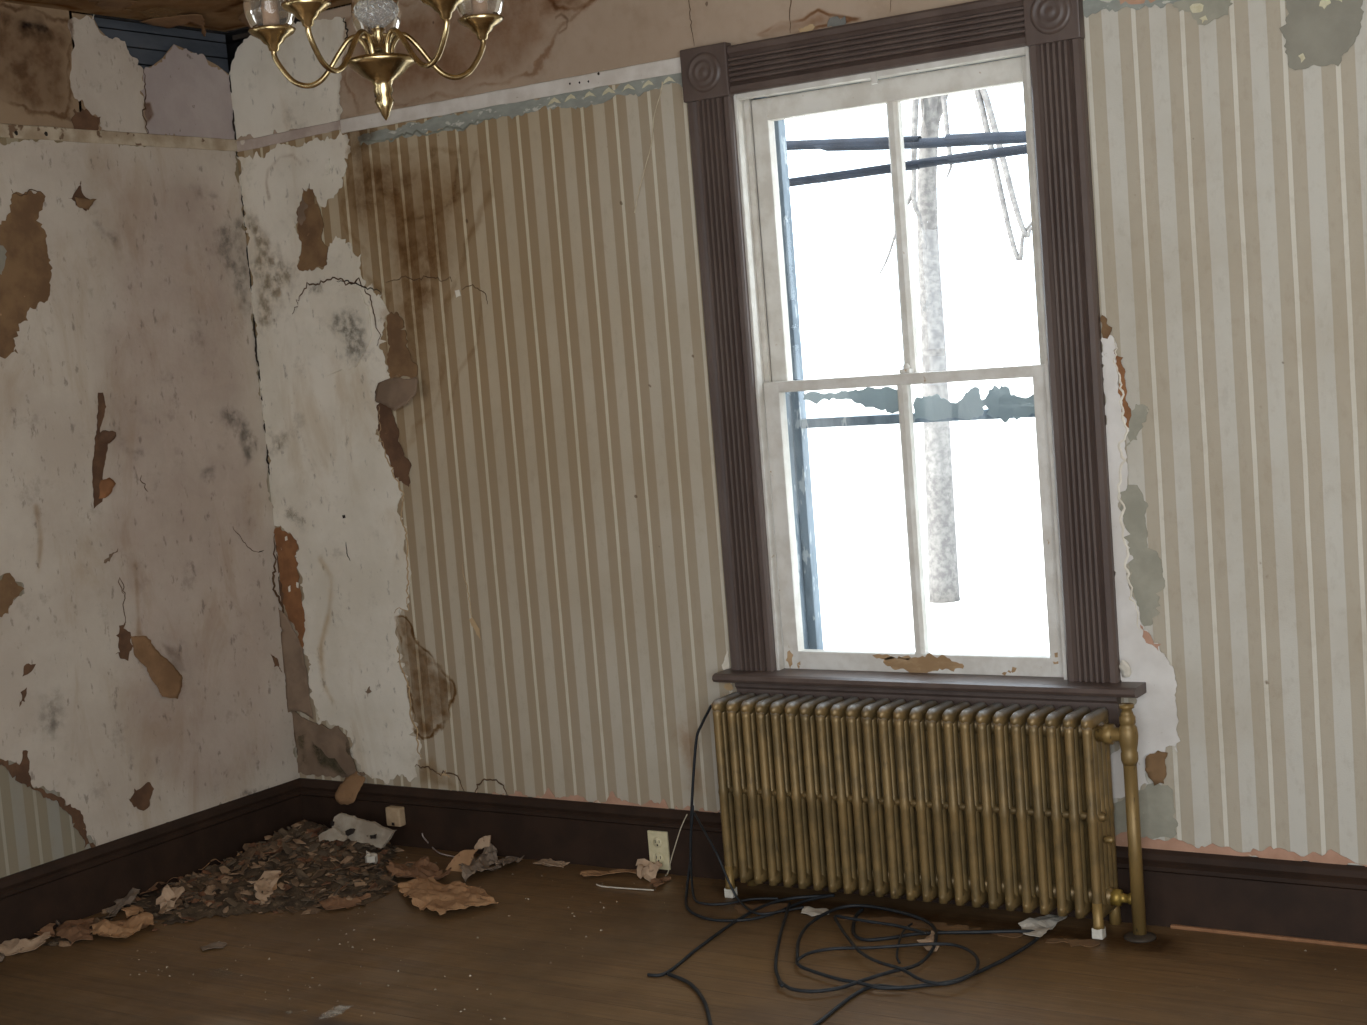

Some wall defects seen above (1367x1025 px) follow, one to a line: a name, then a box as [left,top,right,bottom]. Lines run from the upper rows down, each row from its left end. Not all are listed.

flaking render [0,0,423,846]
crack [229,76,270,475]
crack [272,534,284,613]
crack [292,277,382,377]
peeling [872,653,964,673]
flaking render [1100,315,1180,839]